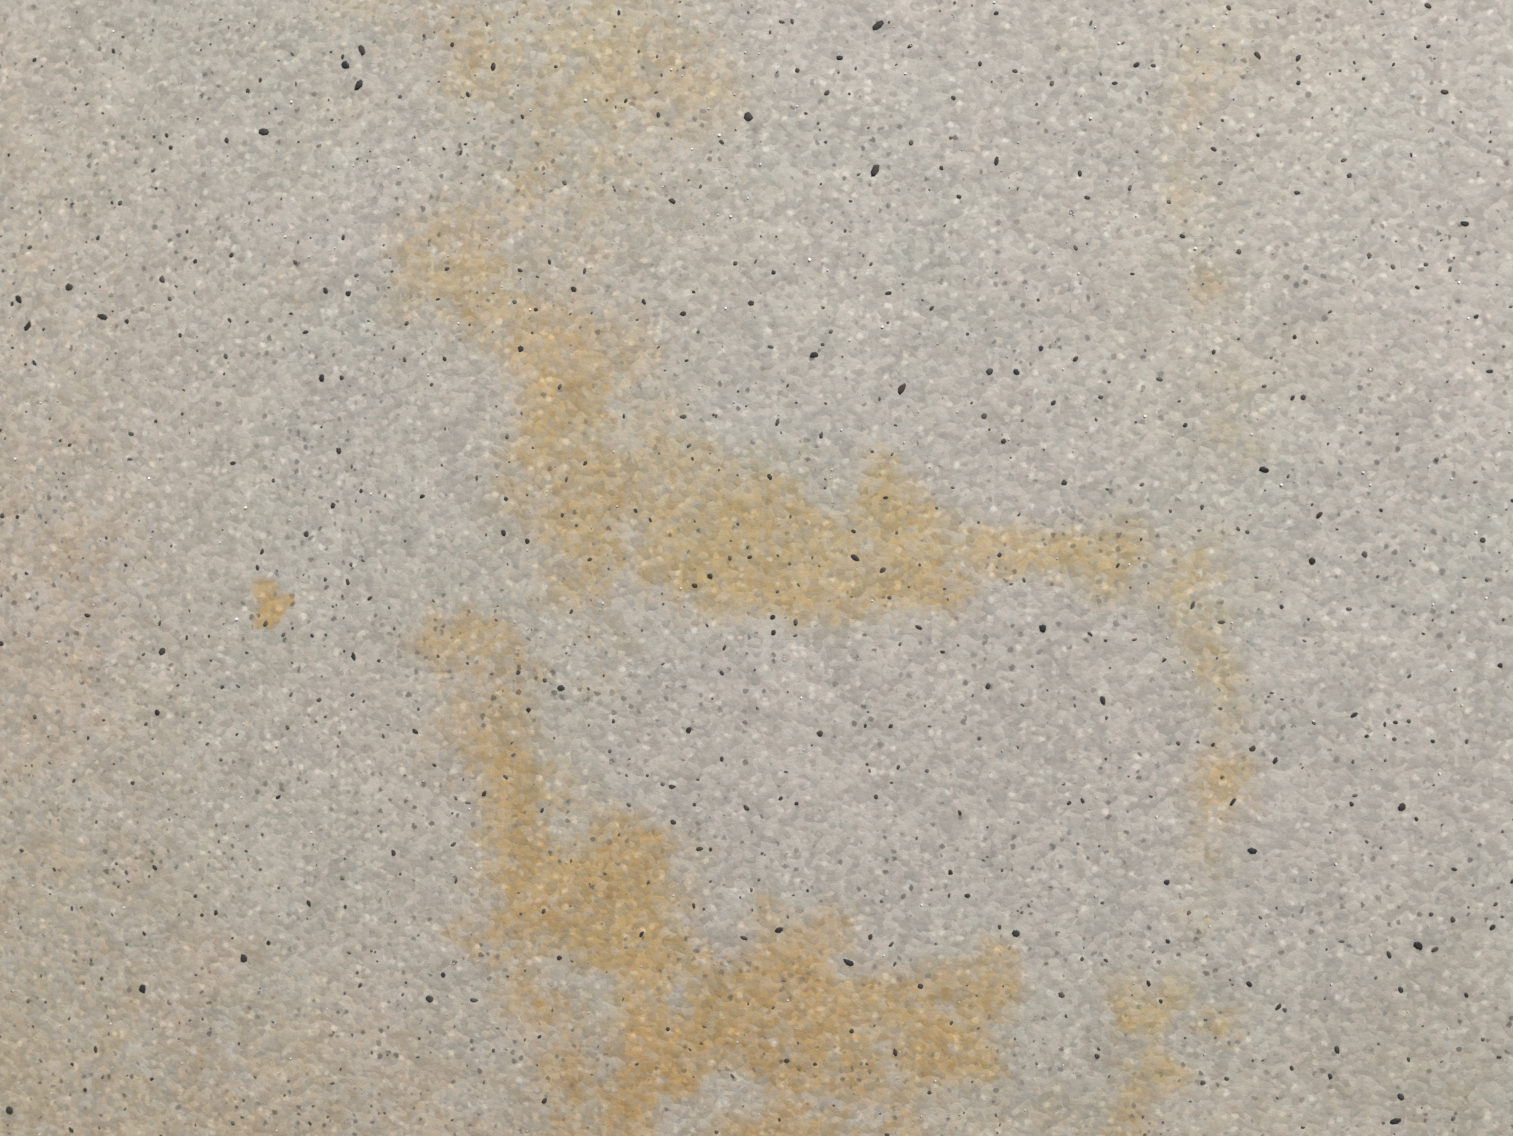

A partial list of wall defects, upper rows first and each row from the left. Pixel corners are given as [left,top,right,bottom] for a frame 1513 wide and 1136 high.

corrosion [248,575,300,636]
corrosion [365,180,1281,1136]